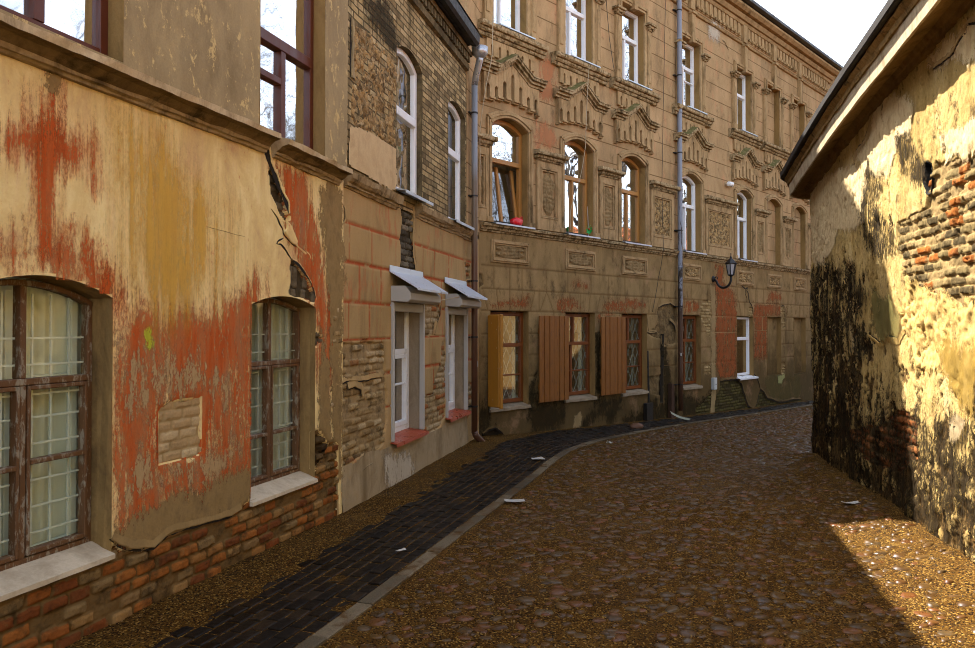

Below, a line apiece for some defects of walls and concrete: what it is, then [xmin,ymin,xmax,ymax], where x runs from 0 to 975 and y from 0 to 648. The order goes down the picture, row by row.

flaking render [351,26,397,146]
crack [265,147,317,299]
leakage [856,157,896,267]
flaking render [898,157,975,308]
flaking render [0,117,387,648]
leakage [809,254,975,565]